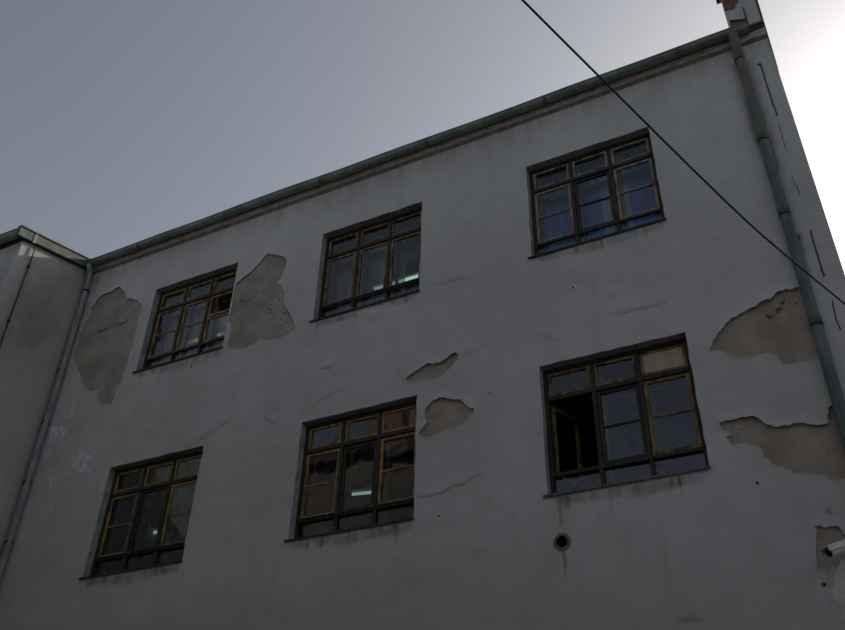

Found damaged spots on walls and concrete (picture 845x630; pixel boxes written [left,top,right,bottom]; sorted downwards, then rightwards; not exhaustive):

flaking render [722,0,747,27]
spalling [71,281,146,407]
spalling [225,248,299,352]
spalling [702,278,820,368]
spalling [401,345,480,440]
spalling [710,395,845,486]
spalling [803,513,845,588]